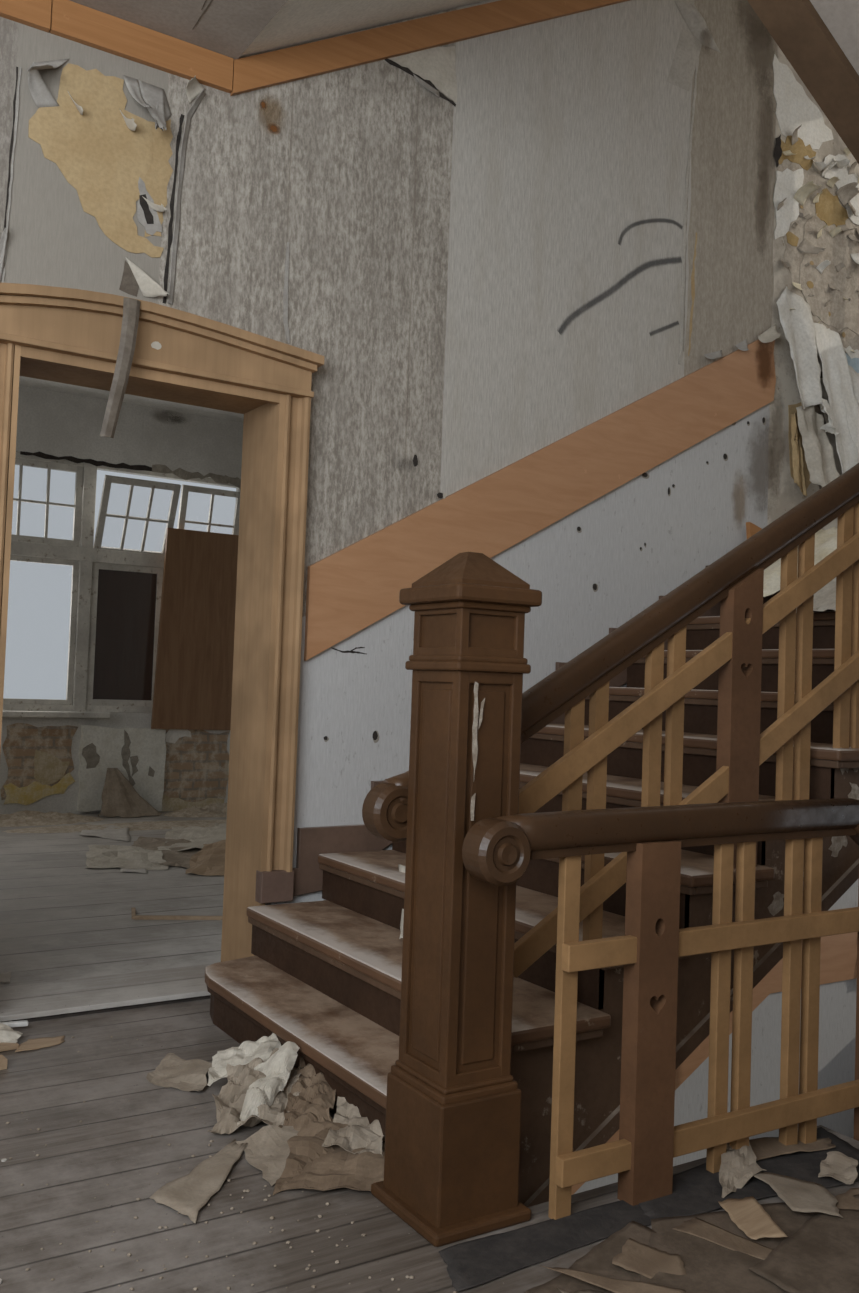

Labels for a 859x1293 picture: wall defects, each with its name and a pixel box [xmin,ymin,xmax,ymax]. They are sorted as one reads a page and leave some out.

crack [193,0,213,29]
peeling [773,54,859,373]
flaking render [0,723,100,805]
flaking render [121,729,229,811]